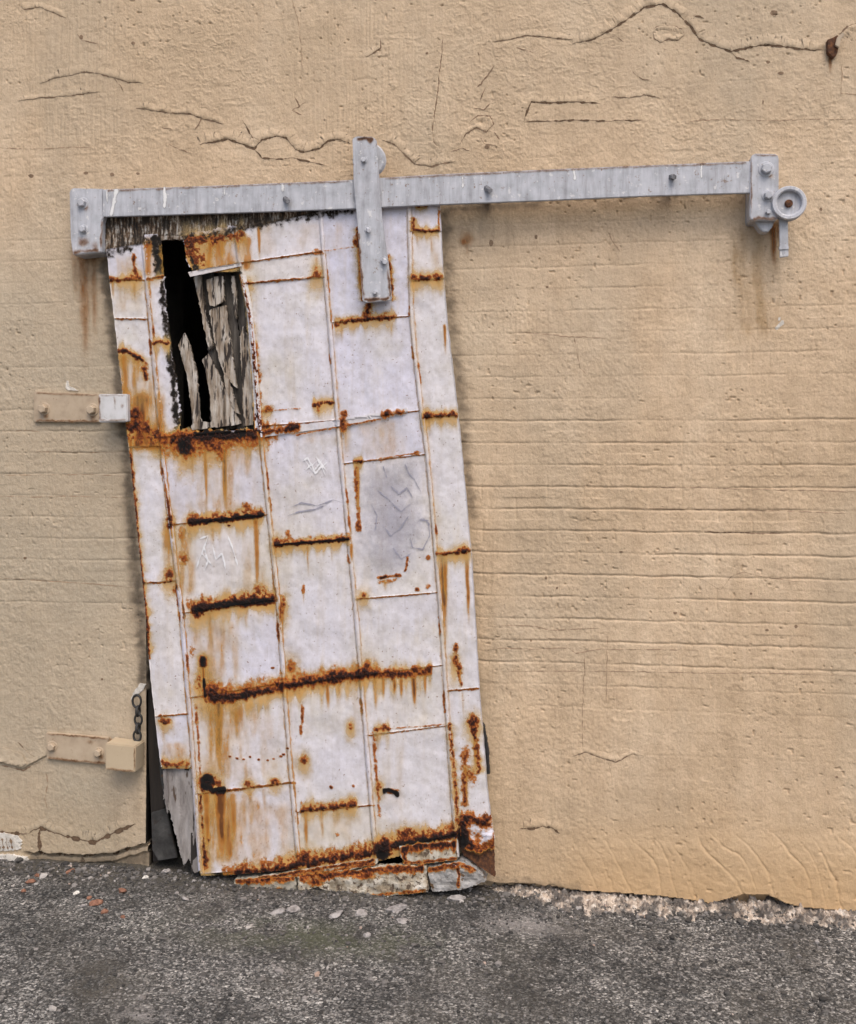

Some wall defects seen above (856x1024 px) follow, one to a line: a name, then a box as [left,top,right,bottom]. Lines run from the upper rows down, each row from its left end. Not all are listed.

crack [18,2,353,165]
crack [382,0,856,167]
corrosion [37,223,496,889]
crack [486,625,850,776]
crack [0,742,143,862]